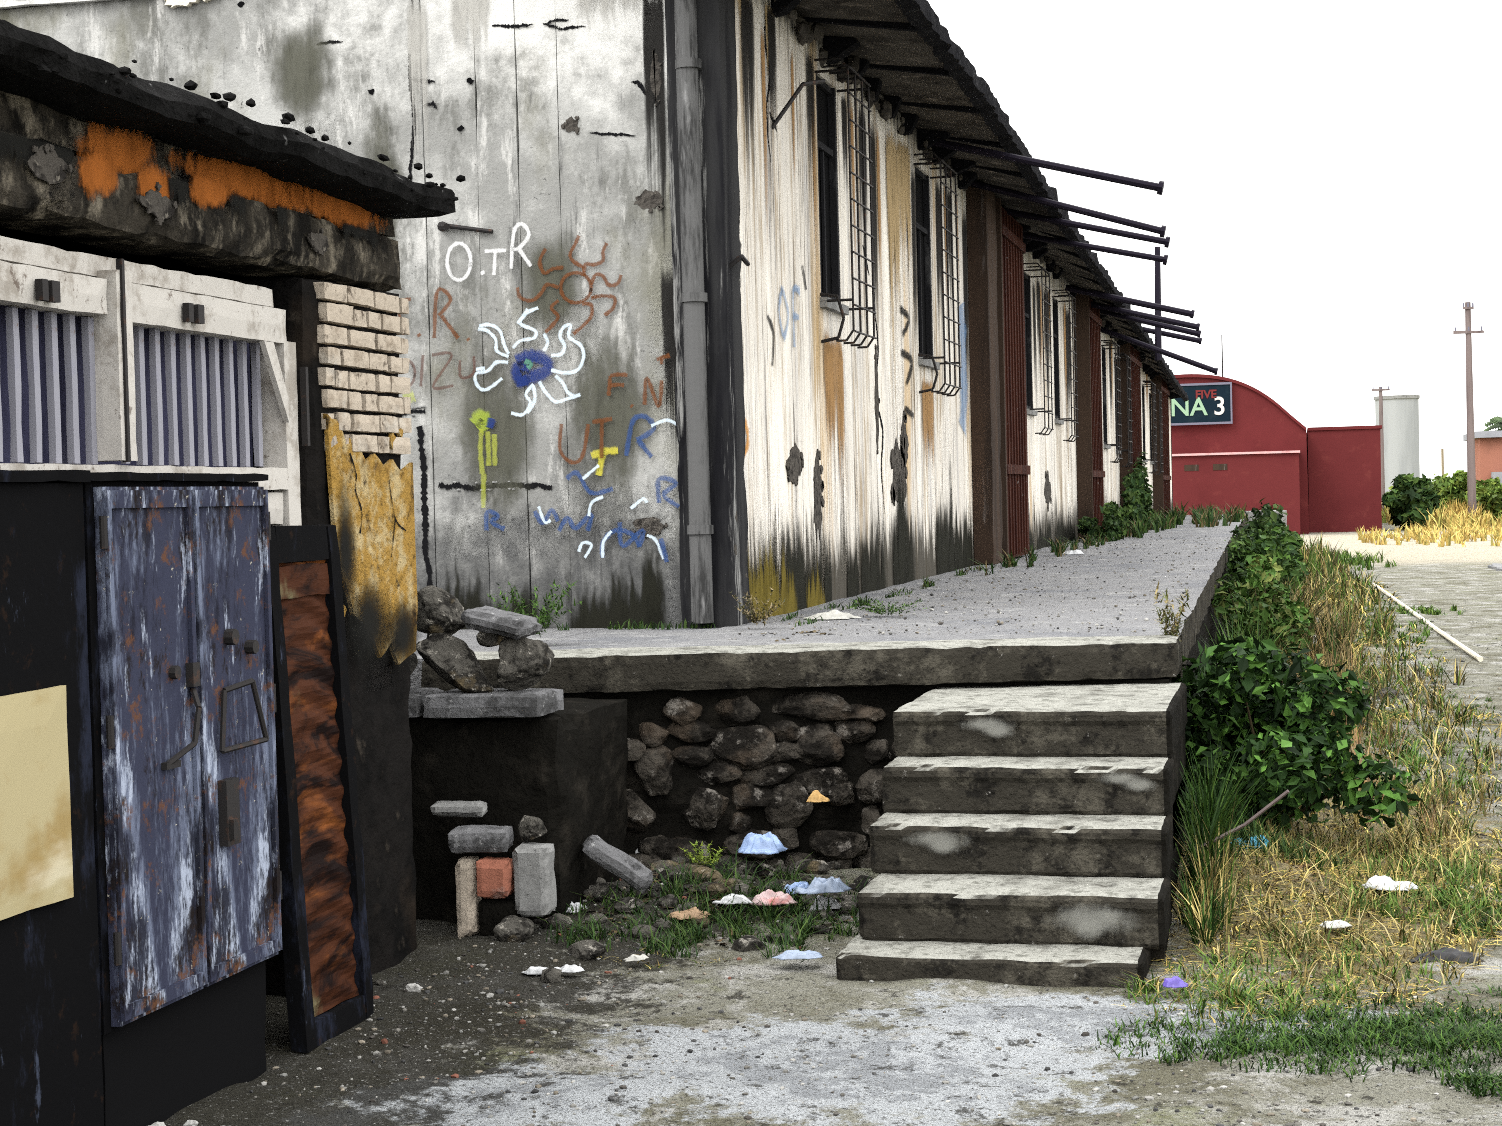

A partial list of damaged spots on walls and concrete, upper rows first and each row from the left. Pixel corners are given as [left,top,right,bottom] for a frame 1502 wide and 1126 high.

damp [272,28,327,113]
corrosion [78,123,379,231]
damp [367,117,400,175]
flaking render [323,413,418,665]
damp [747,485,915,618]
damp [936,460,974,575]